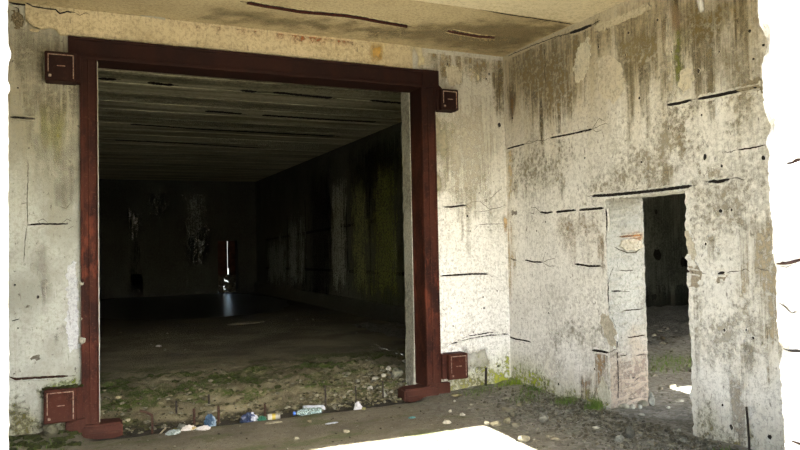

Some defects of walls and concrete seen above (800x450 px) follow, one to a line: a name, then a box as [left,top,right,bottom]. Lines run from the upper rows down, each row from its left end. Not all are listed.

damp [357,25,586,122]
peeling [572,2,651,104]
damp [597,0,749,126]
crack [667,70,760,109]
crack [507,118,608,151]
damp [593,108,699,192]
crack [22,173,73,256]
crack [443,188,502,230]
spalling [598,313,618,349]